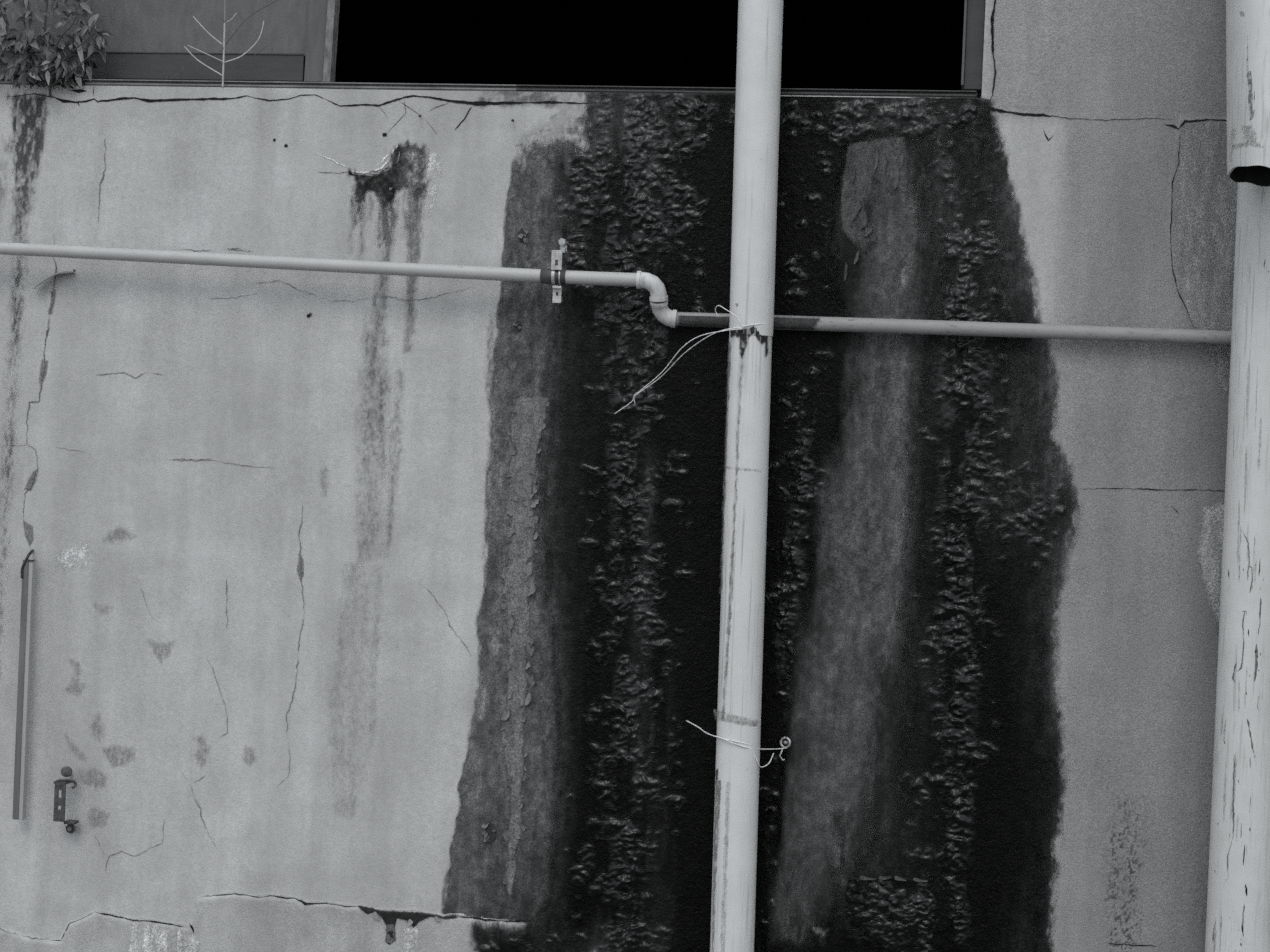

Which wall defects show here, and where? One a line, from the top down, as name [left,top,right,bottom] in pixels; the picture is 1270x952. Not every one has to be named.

water stain [2,94,46,233]
crack [18,87,588,134]
water stain [407,276,416,320]
water stain [407,153,442,261]
crack [985,0,1227,319]
crack [11,328,83,547]
water stain [442,91,736,952]
water stain [754,96,1077,952]
crack [277,506,304,787]
peeling [482,396,549,895]
crack [0,893,358,941]
water stain [1111,804,1140,949]